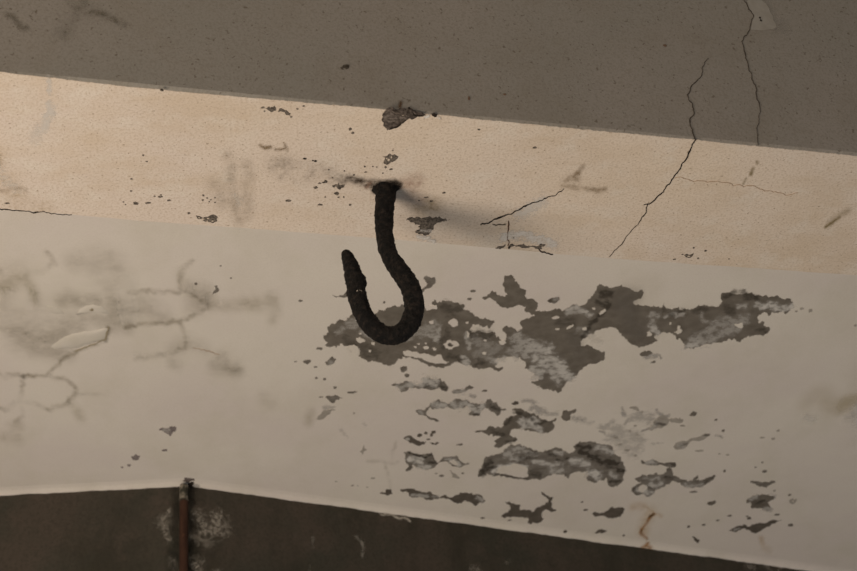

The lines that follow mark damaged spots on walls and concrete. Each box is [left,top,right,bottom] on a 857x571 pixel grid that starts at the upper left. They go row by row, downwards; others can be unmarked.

crack [741,1,761,145]
spalling [382,101,440,130]
crack [609,58,795,257]
crack [480,172,579,248]
peeling [407,216,447,243]
peeling [496,237,553,255]
peeling [294,275,812,497]
water stain [191,508,229,539]
peeling [380,488,485,506]
peeling [501,491,556,524]
peeling [581,501,624,519]
peeling [729,462,793,534]